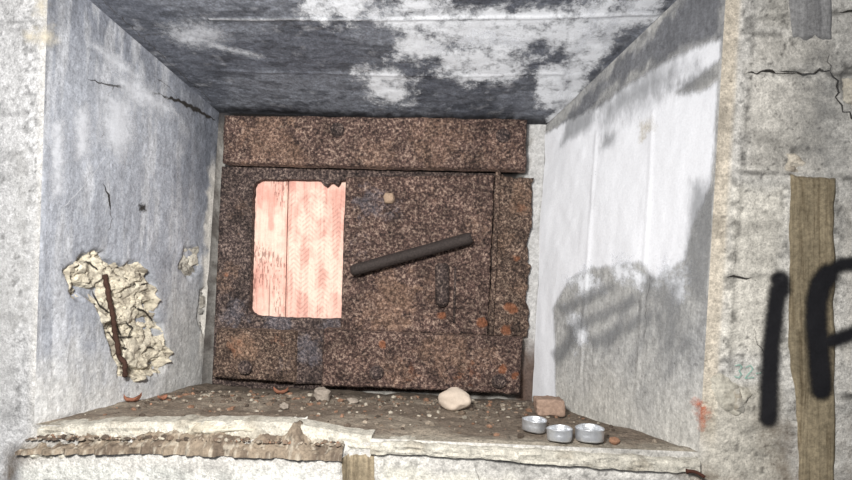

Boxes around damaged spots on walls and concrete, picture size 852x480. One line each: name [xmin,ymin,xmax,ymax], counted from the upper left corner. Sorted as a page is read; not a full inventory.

damp [93,45,140,78]
damp [209,43,258,56]
crack [748,56,852,119]
spalling [62,250,174,382]